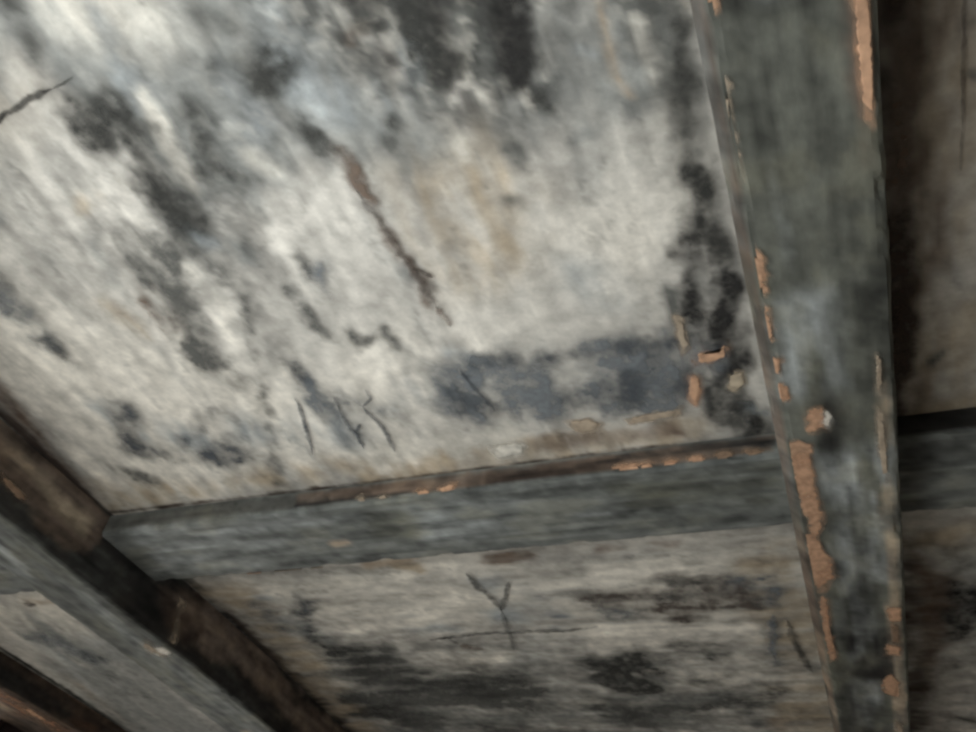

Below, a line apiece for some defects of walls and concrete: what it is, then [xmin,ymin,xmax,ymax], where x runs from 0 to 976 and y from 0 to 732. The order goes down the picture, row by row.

crack [0,81,67,123]
damp [64,92,141,157]
damp [302,127,377,203]
peeling [853,0,873,121]
damp [126,171,207,316]
damp [576,164,764,437]
peeling [754,249,768,294]
damp [885,43,922,413]
damp [432,355,565,424]
peeling [625,315,727,425]
peeling [727,372,745,392]
peeling [789,408,837,660]